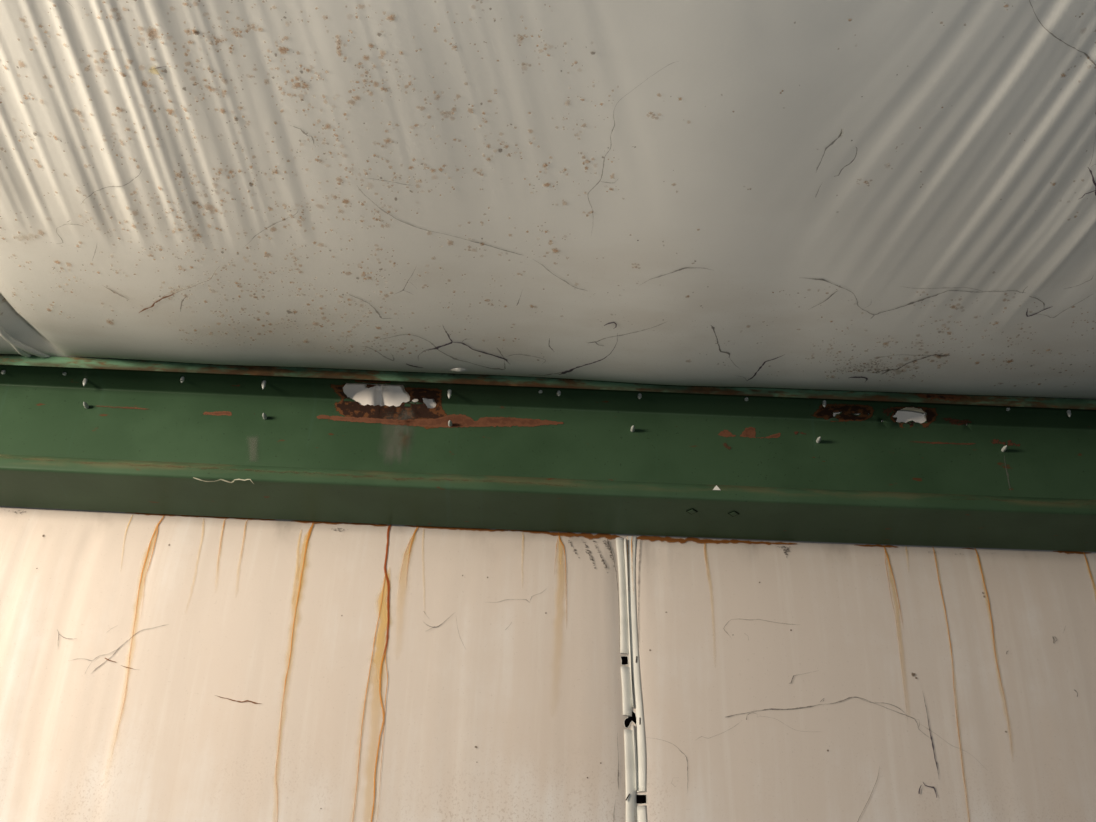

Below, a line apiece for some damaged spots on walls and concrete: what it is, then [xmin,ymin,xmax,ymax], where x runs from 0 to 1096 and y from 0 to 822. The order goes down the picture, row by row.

crack [1035,14,1096,65]
crack [351,295,508,370]
rust [317,371,563,429]
crack [549,330,643,375]
crack [850,354,950,382]
crack [862,290,968,315]
rust [125,512,274,610]
rust [962,548,1001,681]
rust [282,520,391,822]
crack [727,675,939,798]